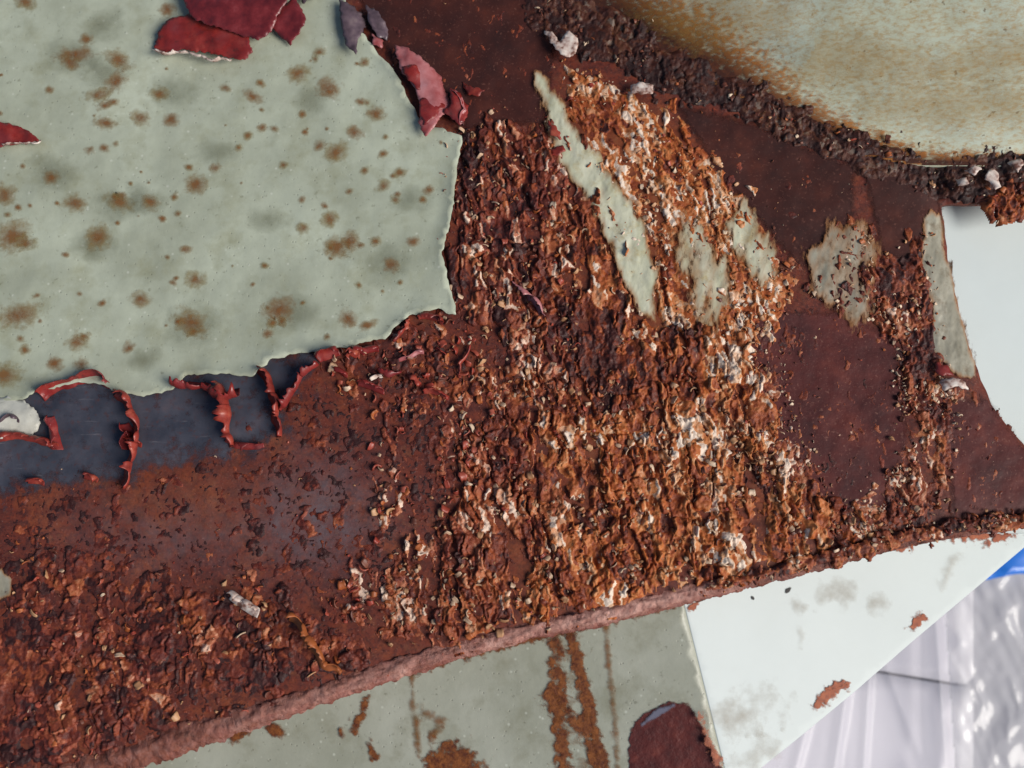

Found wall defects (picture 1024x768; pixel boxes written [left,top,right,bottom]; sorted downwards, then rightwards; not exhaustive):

corrosion [594,0,1000,165]
peeling [0,0,485,494]
peeling [534,70,660,322]
peeling [669,197,778,355]
peeling [806,220,881,331]
peeling [922,209,976,391]
peeling [915,154,1024,190]
corrosion [975,179,1024,227]
corrosion [265,723,285,738]
corrosion [339,695,370,738]
corrosion [411,701,489,768]
corrosion [496,629,610,768]